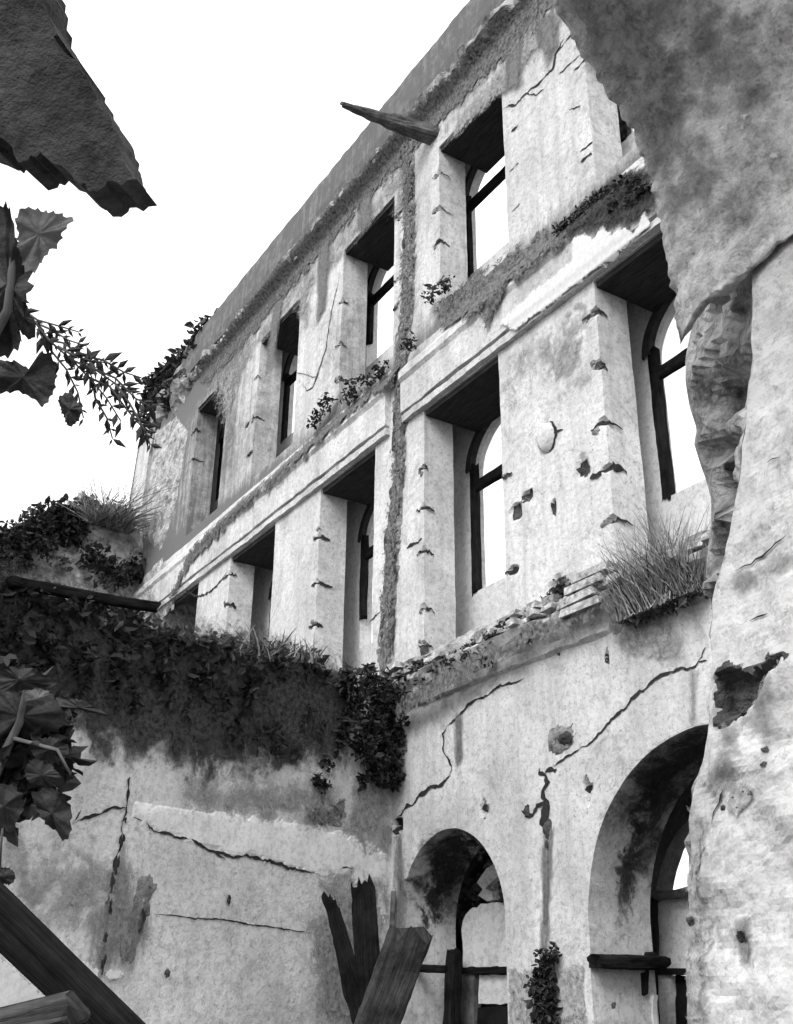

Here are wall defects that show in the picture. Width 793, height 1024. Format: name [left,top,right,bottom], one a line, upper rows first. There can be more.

crack [507,34,585,132]
damp [0,550,348,830]
crack [399,679,522,816]
spalling [548,723,574,755]
crack [521,647,706,851]
peeling [753,652,789,675]
spalling [82,874,157,980]
crack [75,806,353,874]
damp [309,913,352,1024]
damp [319,867,354,951]
damp [344,784,495,928]
damp [606,714,737,1023]